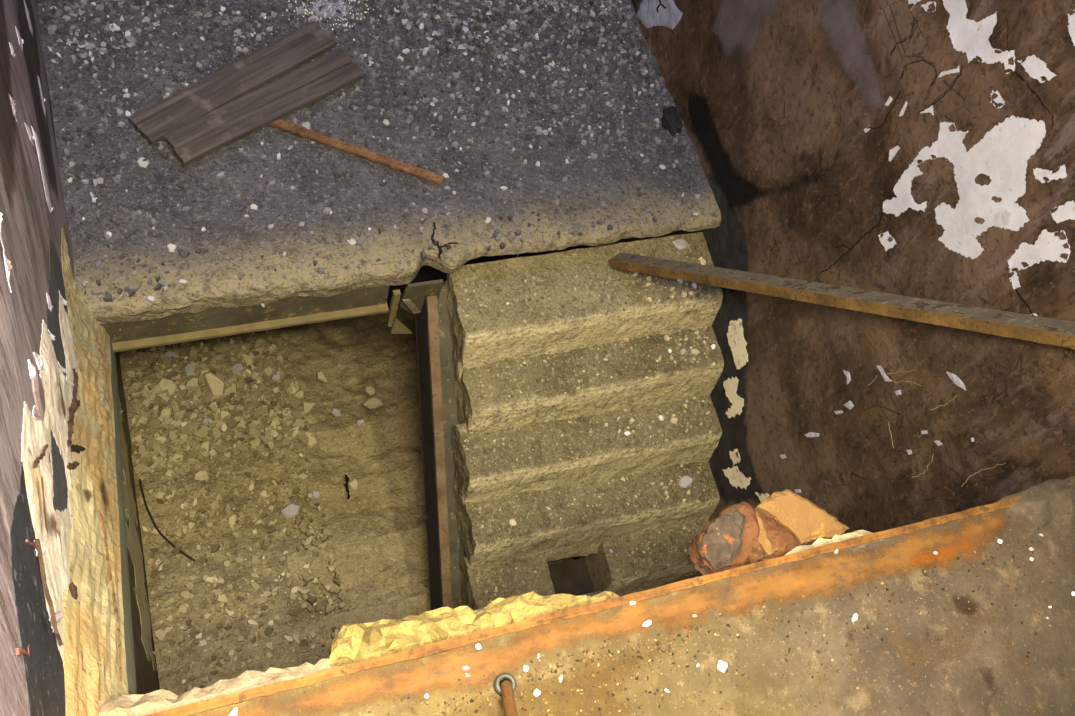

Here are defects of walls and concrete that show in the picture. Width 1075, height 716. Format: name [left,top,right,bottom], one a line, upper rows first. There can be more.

crack [867,33,963,129]
peeling [908,0,1057,83]
peeling [1067,10,1075,46]
peeling [10,96,54,213]
peeling [882,90,1075,289]
peeling [0,212,12,293]
crack [431,222,458,258]
crack [820,213,883,273]
peeling [878,231,897,251]
flaking render [10,227,80,716]
rust [99,515,122,682]
rust [221,515,1006,716]